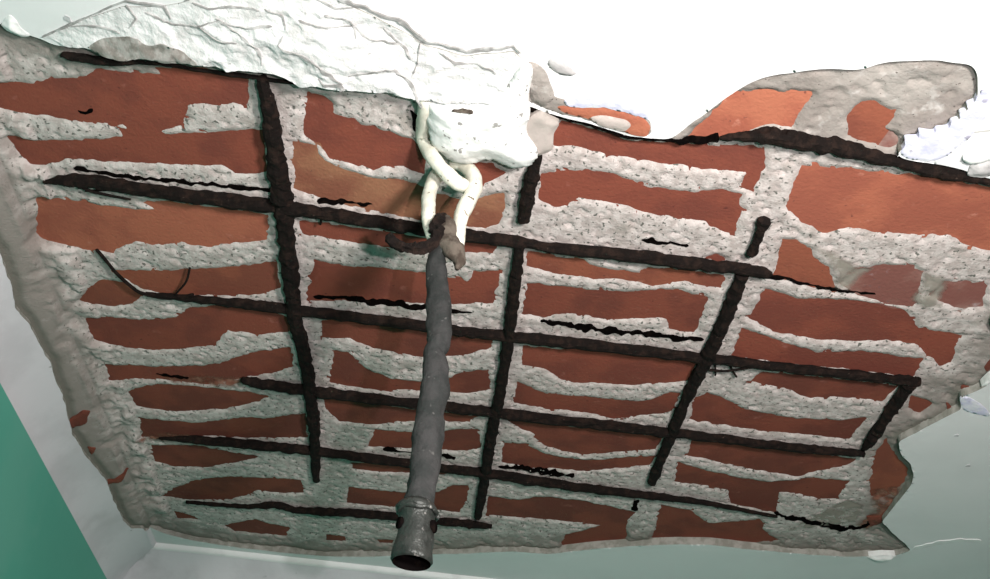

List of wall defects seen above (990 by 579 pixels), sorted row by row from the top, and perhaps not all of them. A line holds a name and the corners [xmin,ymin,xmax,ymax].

flaking render [0,15,432,552]
rust [439,215,466,271]
flaking render [433,58,990,562]